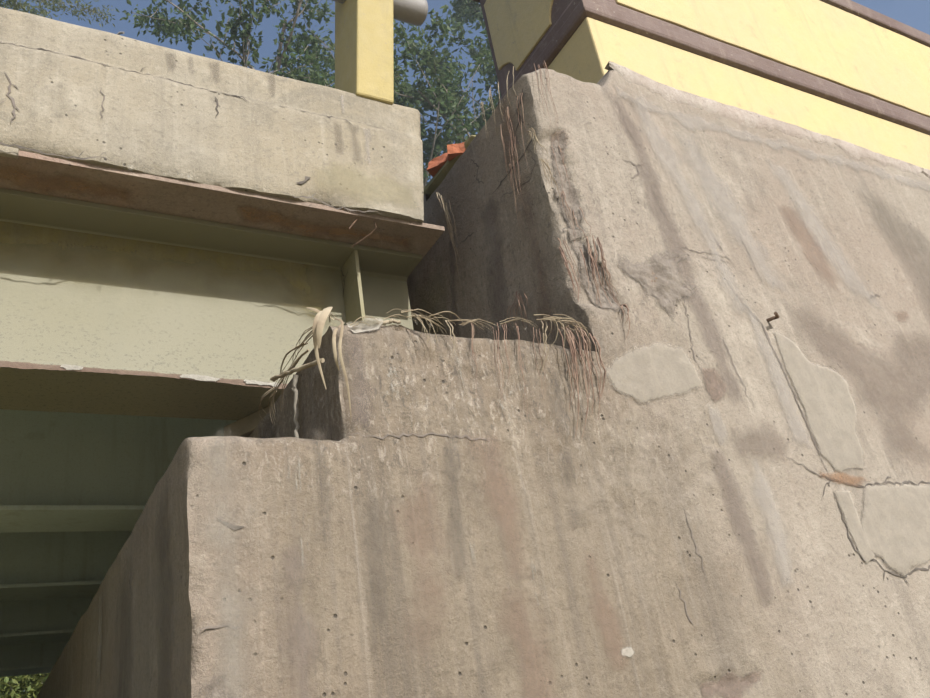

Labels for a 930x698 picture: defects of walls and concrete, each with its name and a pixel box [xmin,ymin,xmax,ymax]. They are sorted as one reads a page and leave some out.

crack [1,71,20,122]
crack [3,42,250,119]
crack [0,142,111,161]
crack [472,88,535,198]
crack [784,455,930,584]